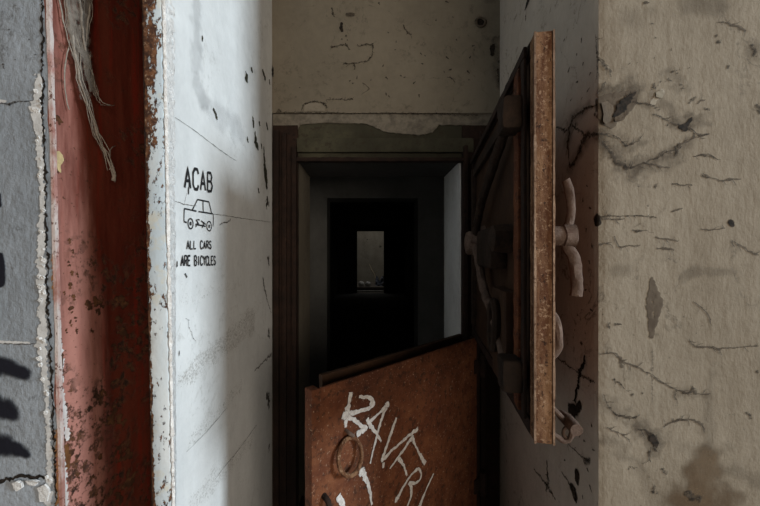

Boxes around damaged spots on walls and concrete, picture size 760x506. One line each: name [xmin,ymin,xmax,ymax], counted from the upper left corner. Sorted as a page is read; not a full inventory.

flaking render [247,97,492,207]
flaking render [594,83,670,129]
crack [556,34,741,189]
crack [594,208,683,255]
peeling [29,73,53,506]
corrosion [63,238,79,334]
corrosion [85,296,105,316]
damp [646,277,664,339]
crack [557,333,710,464]
corrosion [54,430,75,506]